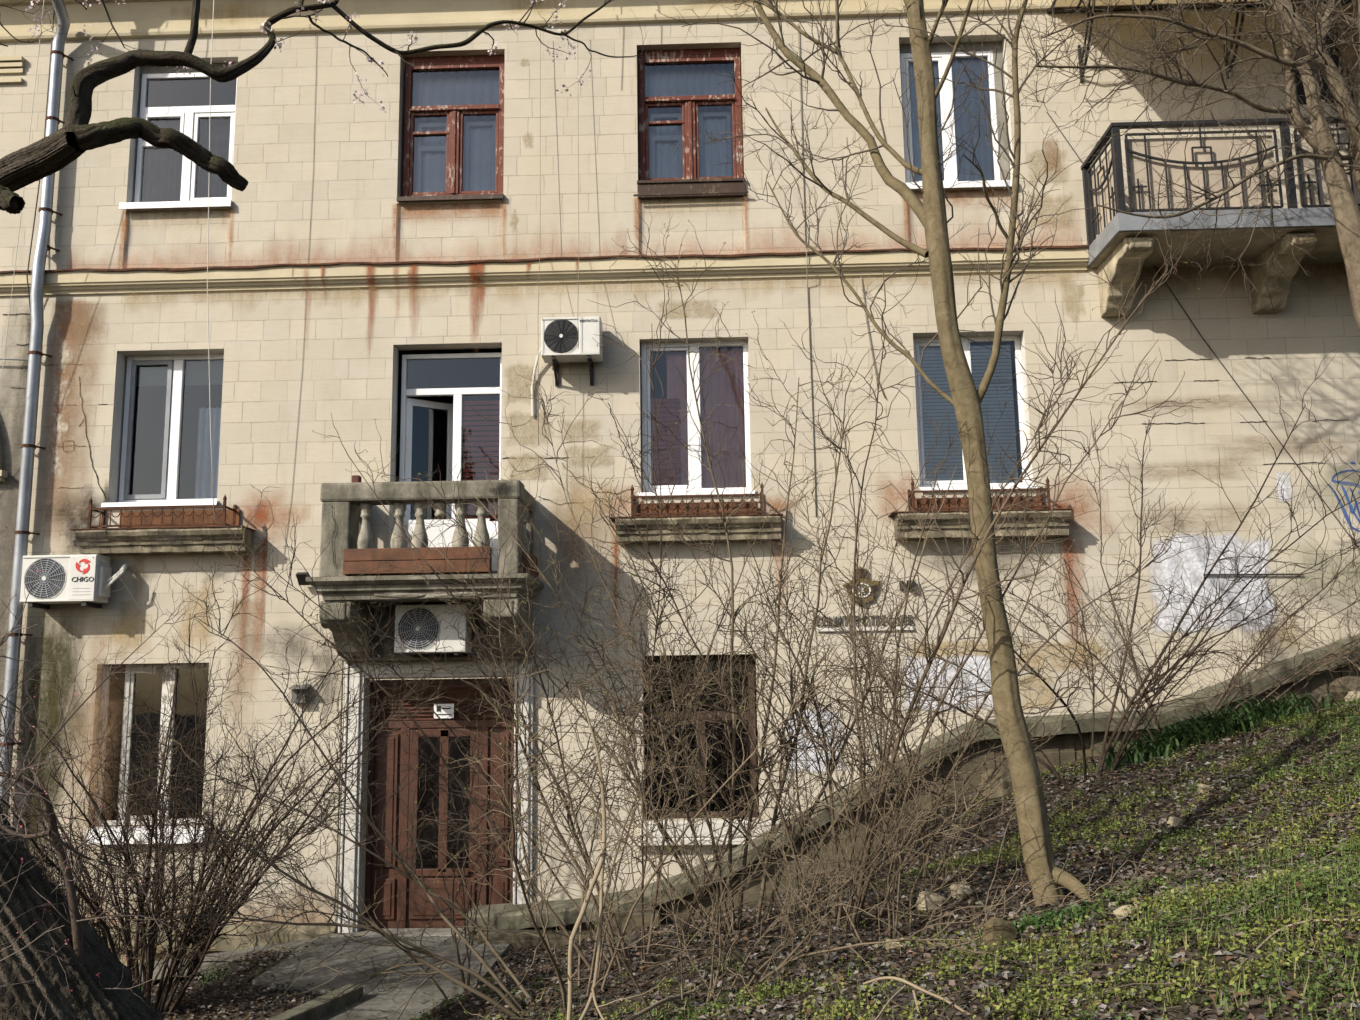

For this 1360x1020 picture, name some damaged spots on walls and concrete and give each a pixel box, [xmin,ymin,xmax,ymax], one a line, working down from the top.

corrosion [394,203,505,226]
corrosion [945,190,1007,199]
corrosion [339,260,379,311]
corrosion [469,262,484,301]
corrosion [52,303,93,459]
corrosion [236,503,284,625]